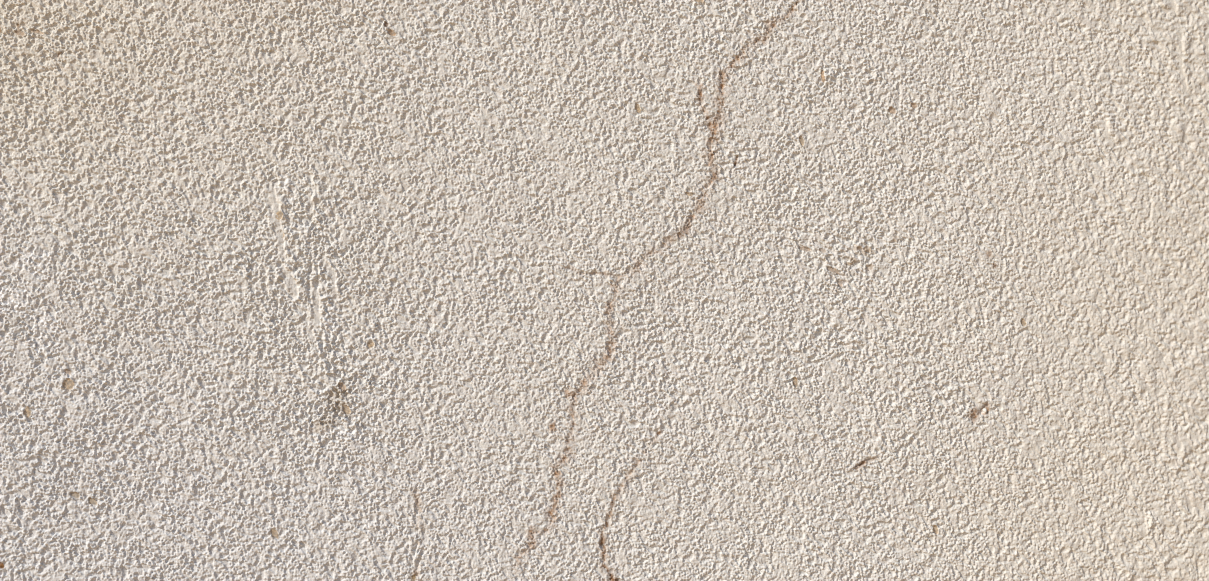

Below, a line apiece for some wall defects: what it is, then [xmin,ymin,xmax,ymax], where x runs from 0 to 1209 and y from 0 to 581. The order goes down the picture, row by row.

crack [508,0,803,581]